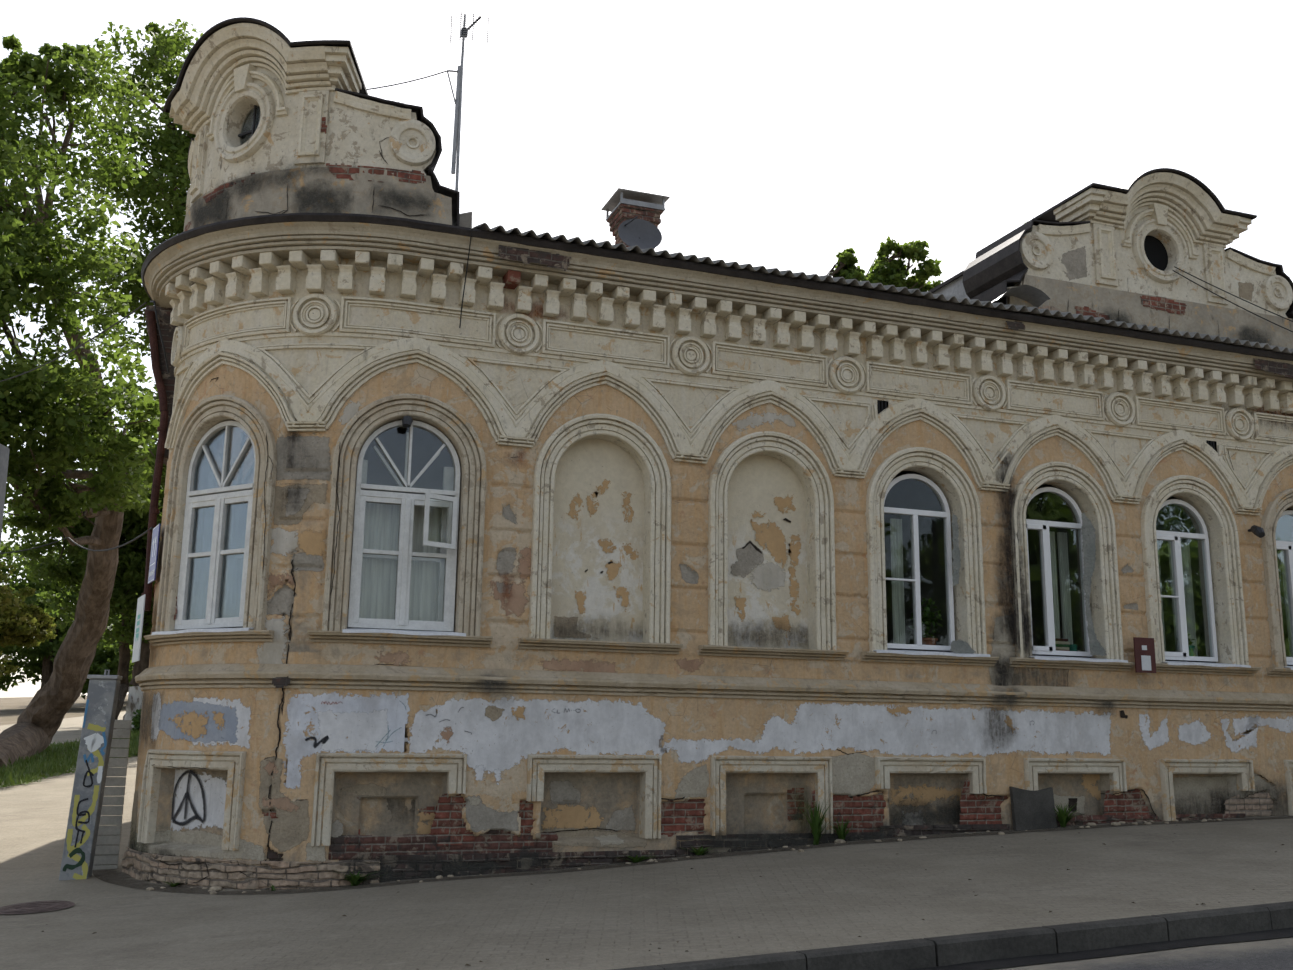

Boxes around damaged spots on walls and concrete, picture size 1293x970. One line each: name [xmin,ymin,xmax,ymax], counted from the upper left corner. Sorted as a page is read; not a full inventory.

flaking render [203,172,255,204]
flaking render [326,163,426,184]
crack [330,445,340,595]
peeling [566,479,634,524]
peeling [585,538,639,612]
peeling [731,494,801,632]
peeling [553,591,597,638]
crack [154,435,307,884]
flaking render [485,705,526,721]
flaking render [129,756,709,862]
flaking render [959,780,1009,825]
flaking render [1054,773,1152,815]